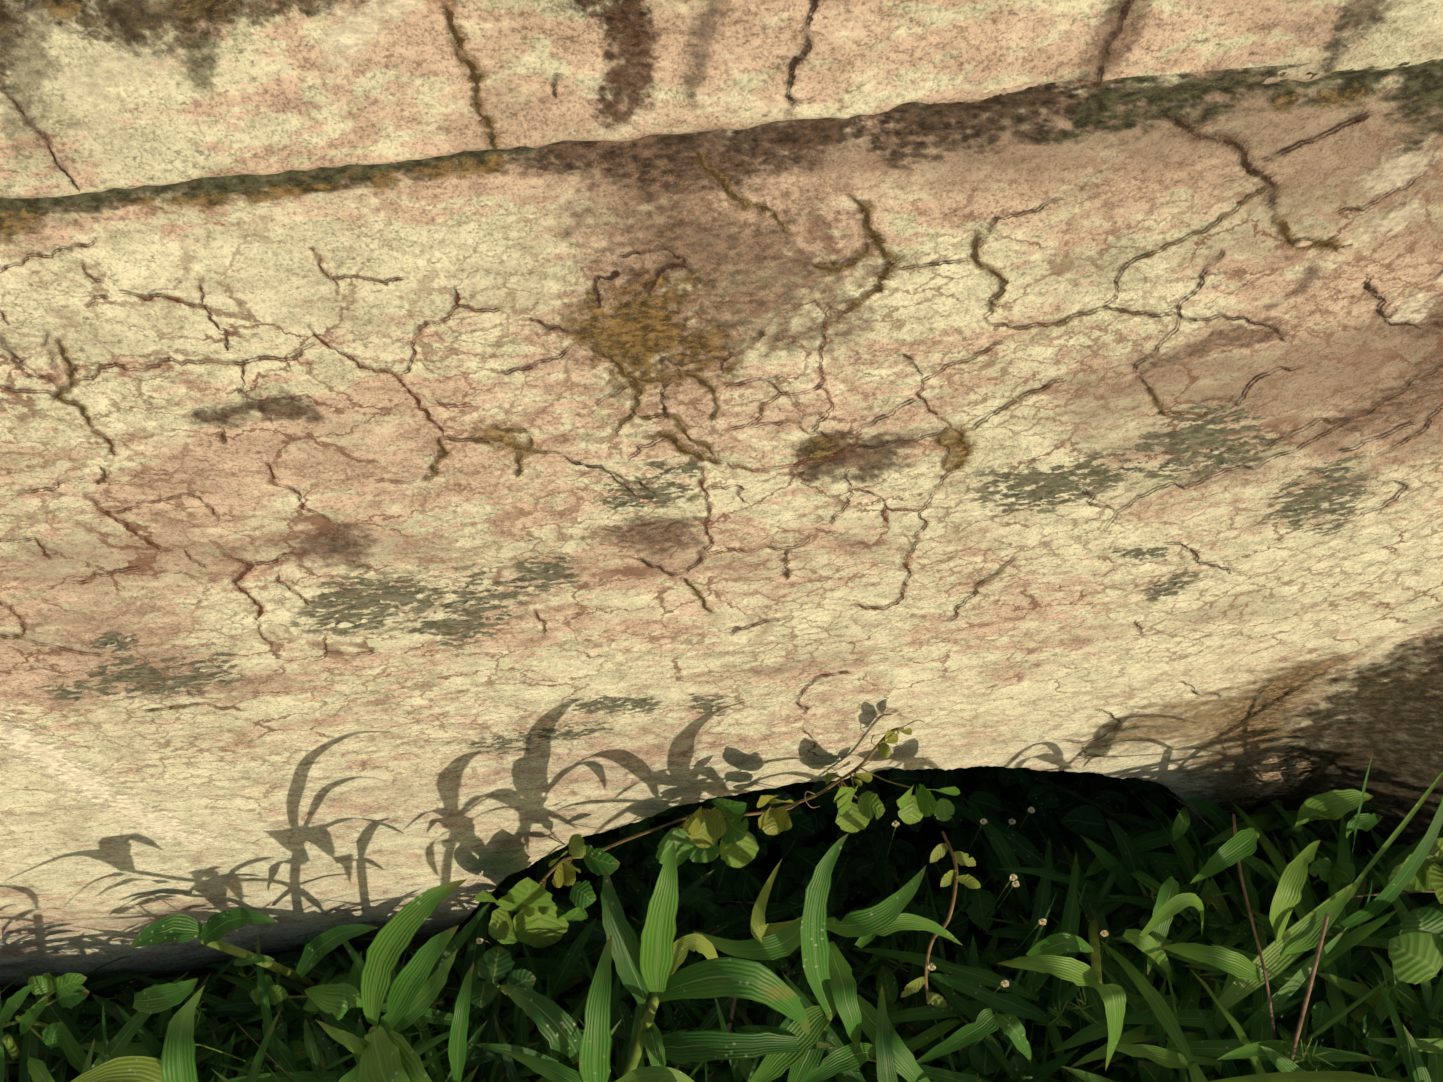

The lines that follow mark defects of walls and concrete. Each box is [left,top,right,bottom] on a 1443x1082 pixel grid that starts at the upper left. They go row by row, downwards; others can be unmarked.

crack [442,5,499,151]
crack [787,0,819,102]
crack [0,89,80,192]
leakage [513,0,1150,357]
crack [0,113,1443,647]
leakage [796,434,915,483]
crack [0,603,99,656]
crack [314,638,376,661]
leakage [1370,613,1443,655]
crack [143,704,247,712]
crack [797,672,851,757]
crack [1066,710,1120,758]